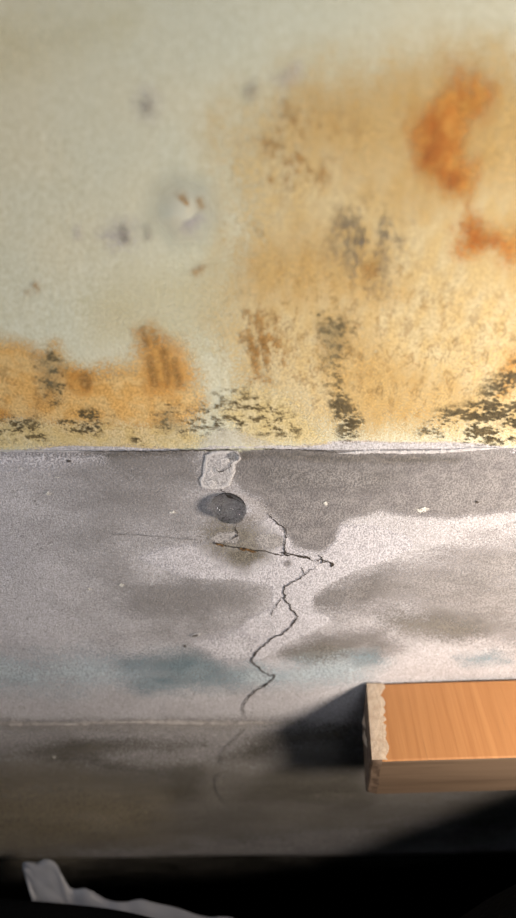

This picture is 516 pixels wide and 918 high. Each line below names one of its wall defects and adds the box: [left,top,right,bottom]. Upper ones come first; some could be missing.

water stain [0,35,516,694]
corrosion [240,309,288,382]
corrosion [451,210,516,265]
crack [113,515,334,800]